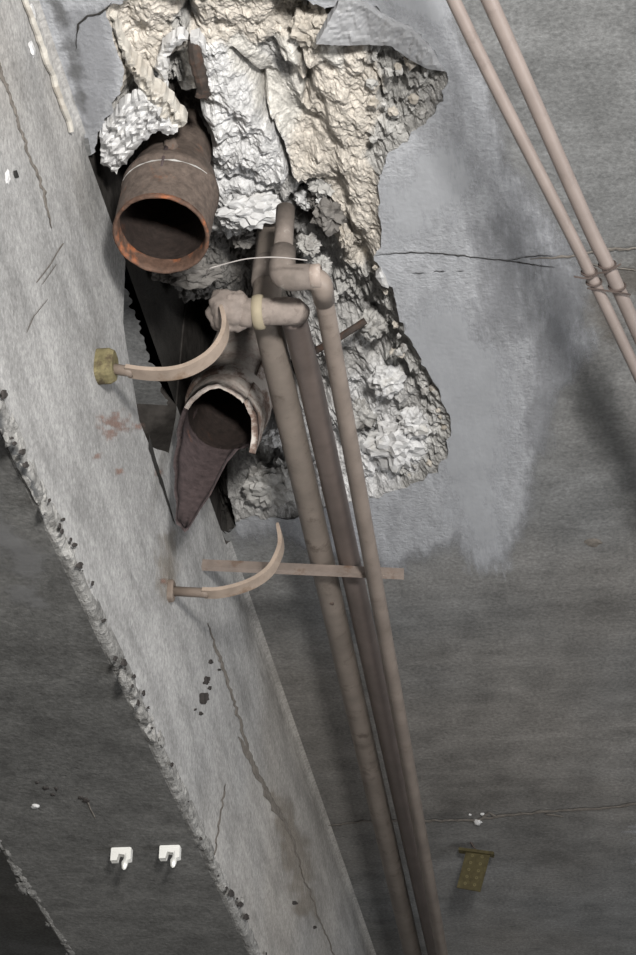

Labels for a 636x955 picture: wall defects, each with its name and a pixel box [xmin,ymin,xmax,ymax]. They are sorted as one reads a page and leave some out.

spalling [97,0,451,508]
crack [380,252,555,274]
spalling [218,407,299,534]